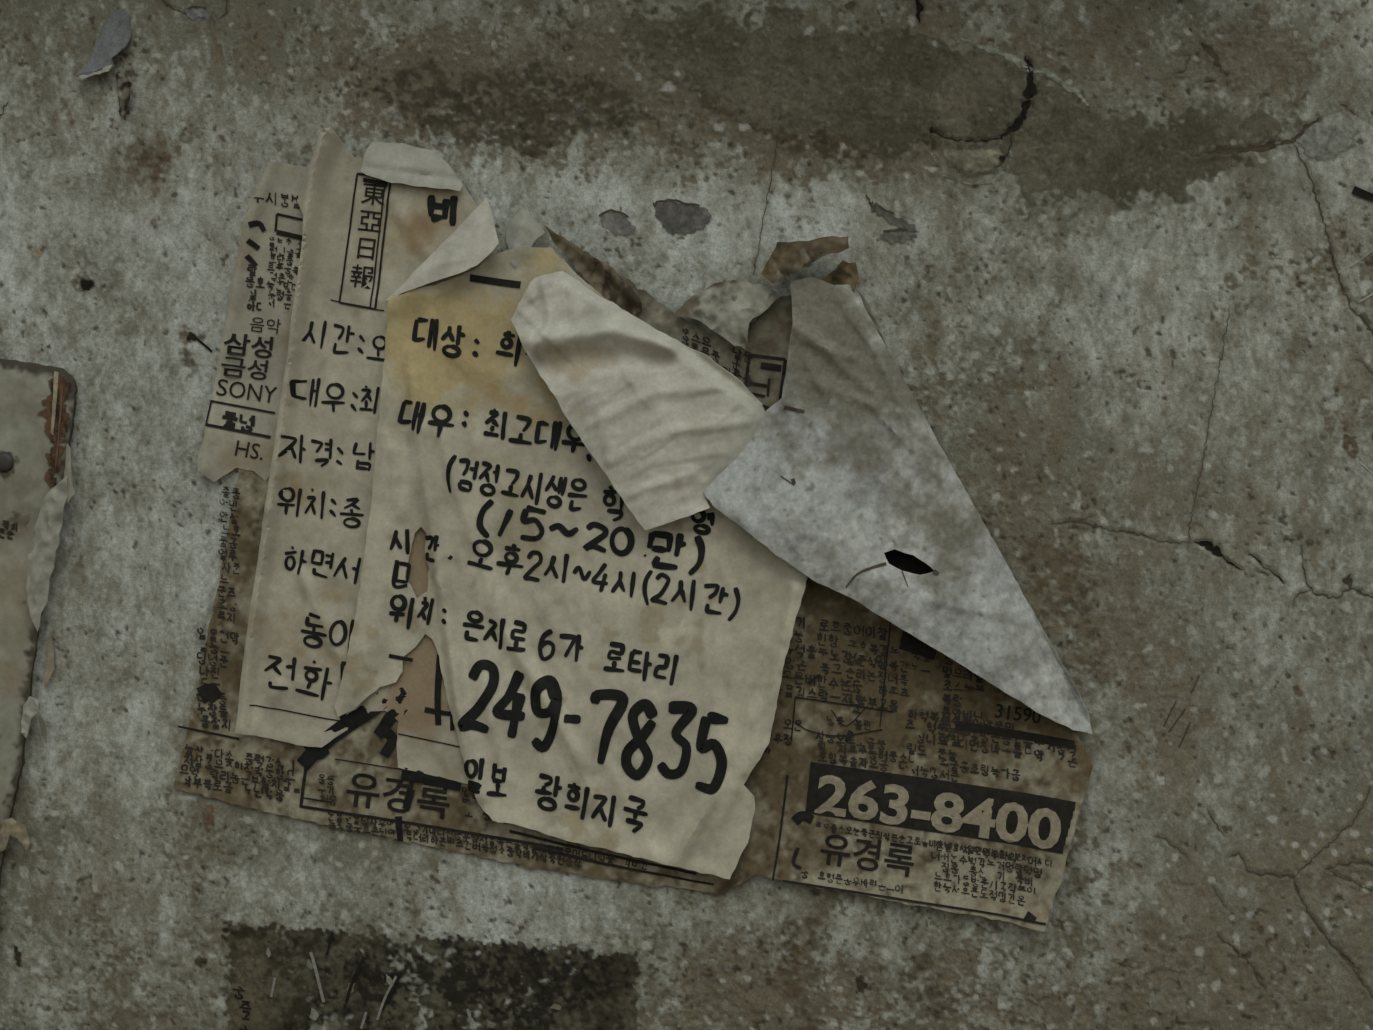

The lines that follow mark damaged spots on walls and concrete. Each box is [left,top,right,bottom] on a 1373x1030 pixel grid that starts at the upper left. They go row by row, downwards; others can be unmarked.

peeling [77,8,132,120]
crack [930,55,1037,167]
crack [1191,104,1373,374]
crack [1052,516,1188,544]
crack [1293,545,1373,607]
crack [1207,787,1373,997]